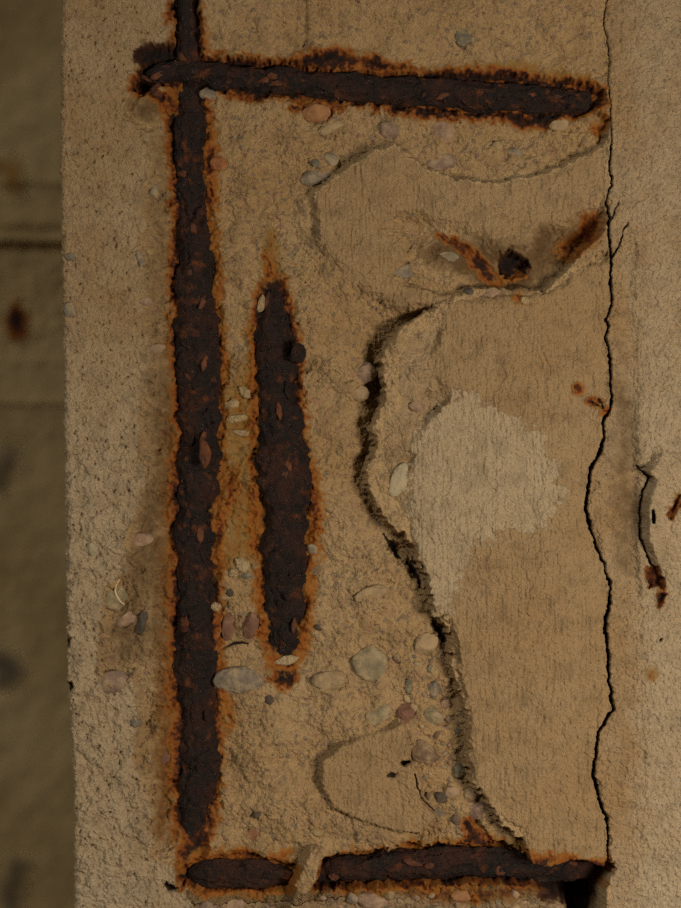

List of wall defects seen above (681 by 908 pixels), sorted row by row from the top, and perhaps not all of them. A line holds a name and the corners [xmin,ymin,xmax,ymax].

rust [126,0,301,901]
spalling [95,0,616,908]
rust [196,0,611,694]
rust [311,816,615,908]
crack [584,0,628,853]
crack [635,465,654,567]